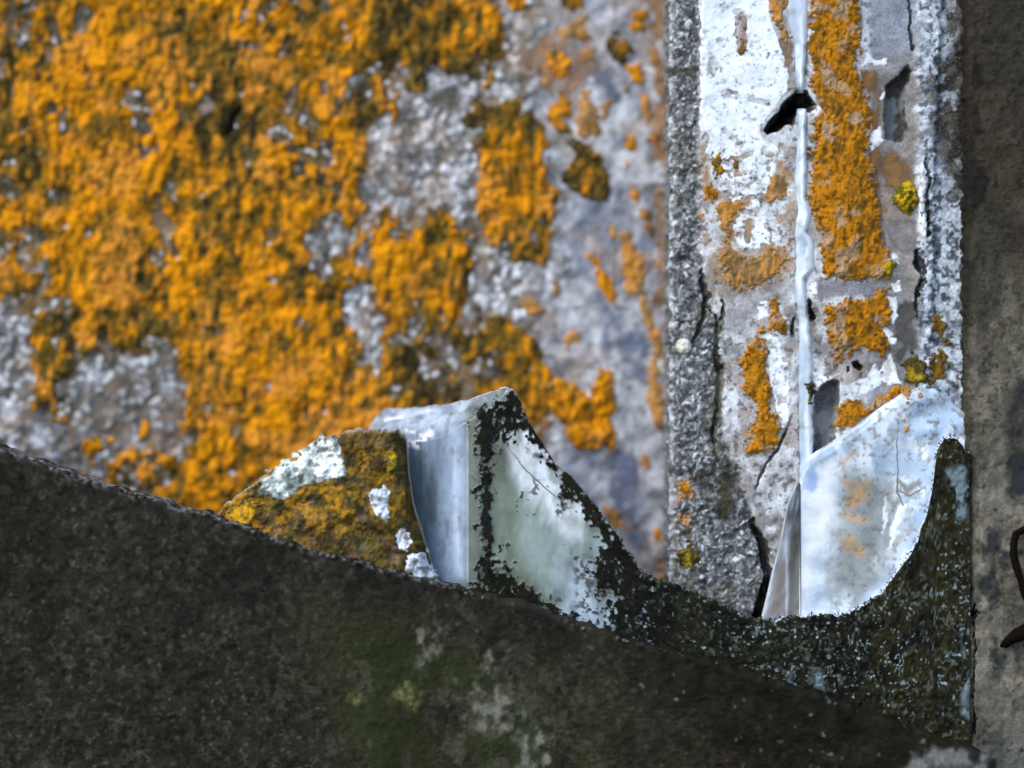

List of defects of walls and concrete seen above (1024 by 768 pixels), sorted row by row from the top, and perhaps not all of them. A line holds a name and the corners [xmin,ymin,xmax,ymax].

peeling [862,53,887,66]
peeling [806,105,822,123]
spalling [869,64,912,151]
crack [755,418,790,491]
crack [747,516,773,619]